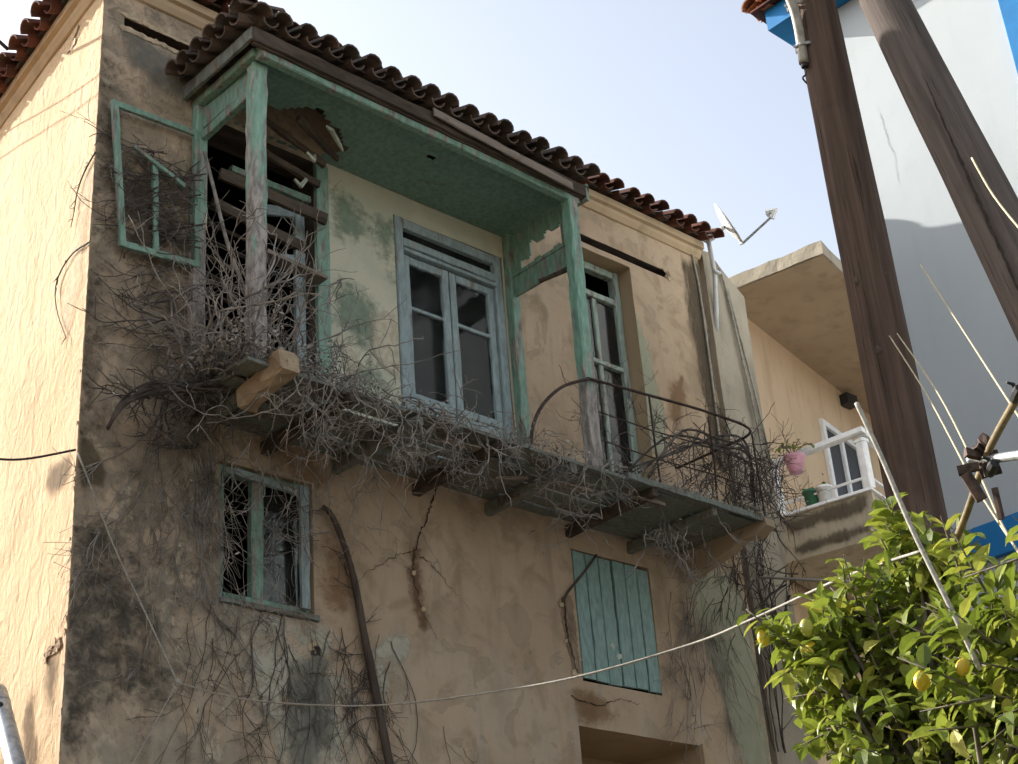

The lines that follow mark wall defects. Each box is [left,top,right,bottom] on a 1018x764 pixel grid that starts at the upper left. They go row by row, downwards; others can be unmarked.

damp [64,524,165,743]
crack [359,488,469,639]